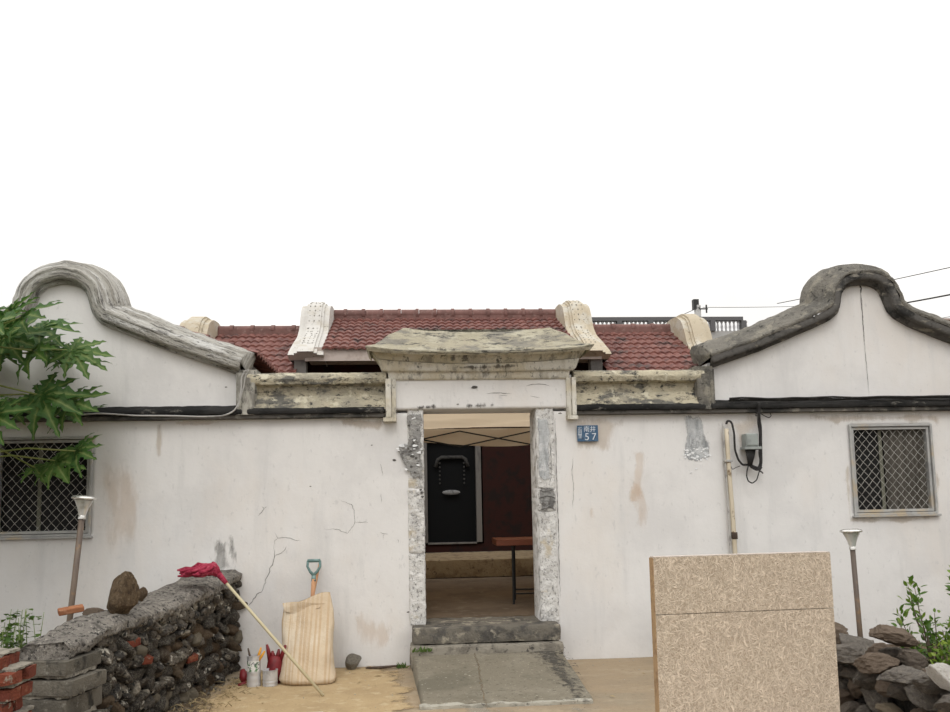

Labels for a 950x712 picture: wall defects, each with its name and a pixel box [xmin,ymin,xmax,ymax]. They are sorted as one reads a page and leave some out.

spalling [393,414,424,498]
peeling [683,416,711,473]